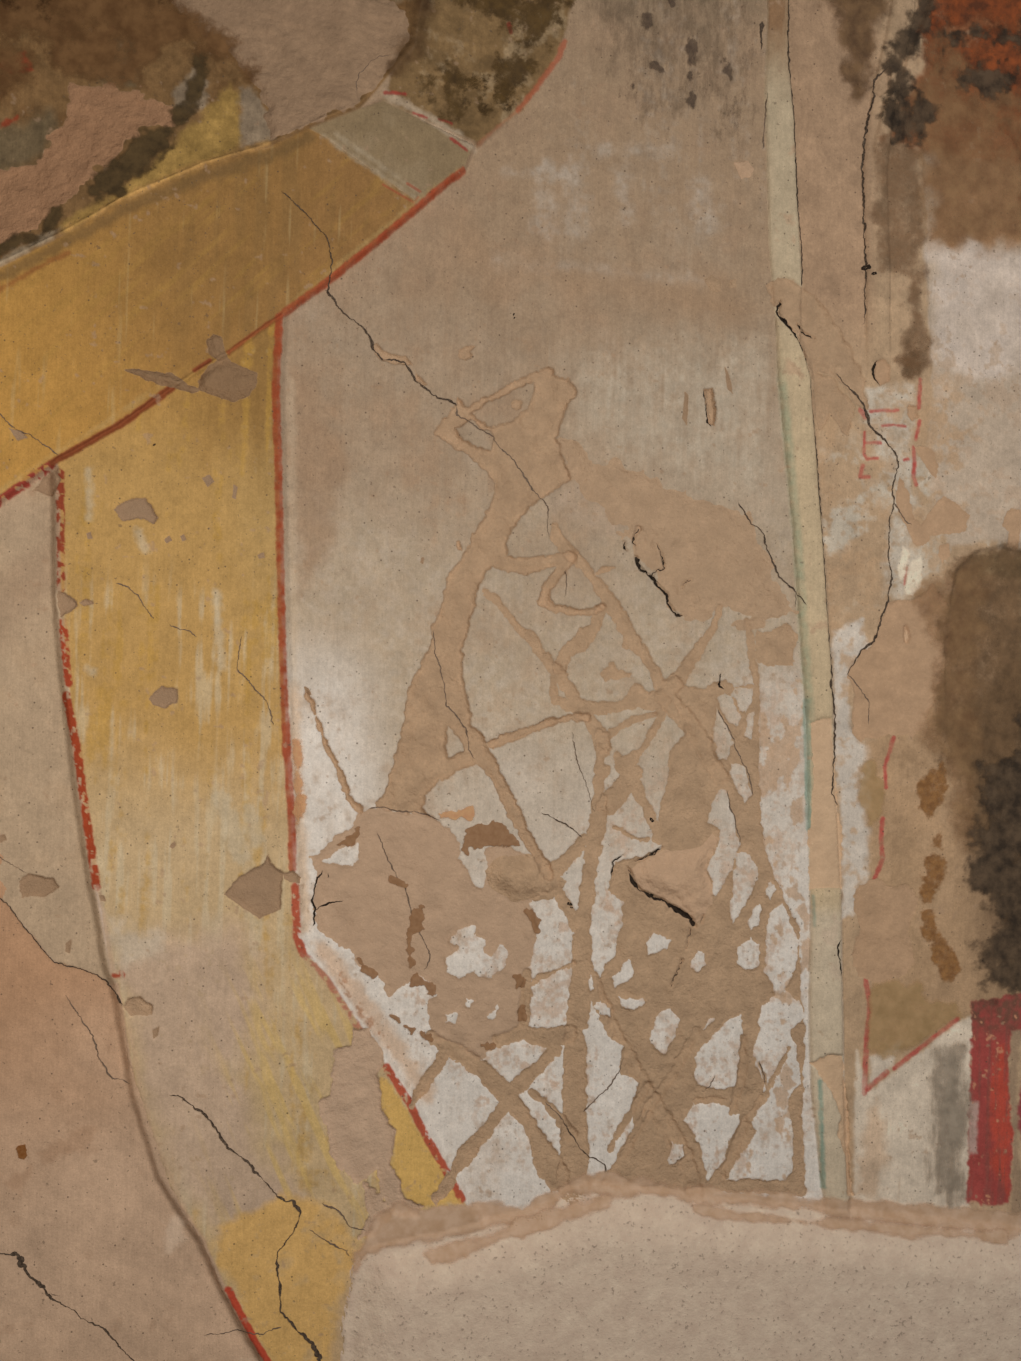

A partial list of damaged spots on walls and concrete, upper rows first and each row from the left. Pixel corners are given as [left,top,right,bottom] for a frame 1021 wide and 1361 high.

water stain [0,206,62,255]
flaking render [0,82,175,244]
water stain [0,0,237,201]
water stain [389,32,423,75]
water stain [420,0,573,121]
water stain [882,0,1021,146]
crack [284,193,549,529]
crack [738,0,911,804]
flaking render [224,366,854,1240]
water stain [917,545,1021,994]
crack [0,1251,134,1361]
crack [170,1095,366,1361]